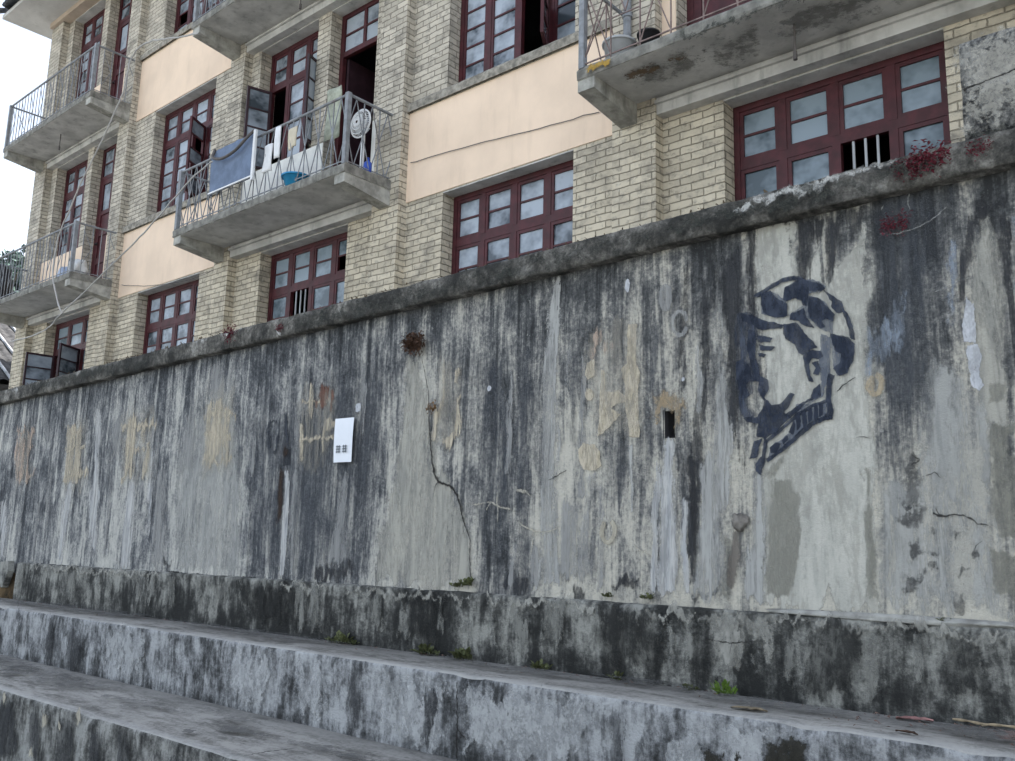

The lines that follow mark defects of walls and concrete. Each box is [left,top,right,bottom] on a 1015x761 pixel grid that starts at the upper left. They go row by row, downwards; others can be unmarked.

damp [949,198,1015,358]
damp [0,428,175,711]
damp [78,405,123,553]
damp [191,407,352,642]
peeling [283,579,323,596]
damp [423,689,438,751]
crack [422,361,560,577]
peeling [487,591,596,615]
damp [503,179,866,646]
damp [592,605,877,713]
peeling [650,216,1015,668]
crack [933,509,988,555]